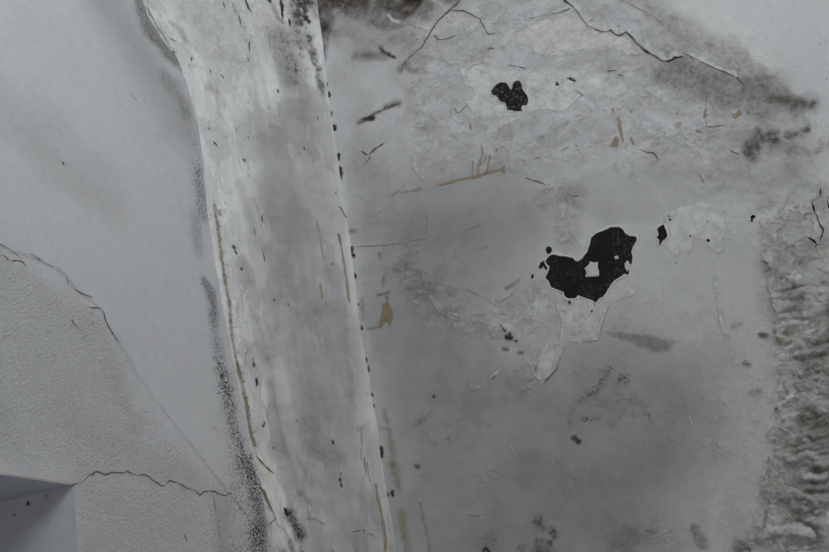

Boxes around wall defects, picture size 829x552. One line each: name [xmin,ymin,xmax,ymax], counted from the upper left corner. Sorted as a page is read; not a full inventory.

mould [292,0,328,33]
mould [340,0,429,28]
crack [401,0,495,71]
crack [529,0,744,85]
peeling [460,65,627,118]
mould [744,132,778,159]
peeling [654,201,726,256]
crack [805,189,829,245]
peeling [531,225,639,380]
mould [201,276,268,552]
crack [72,471,234,550]
crack [257,457,277,525]